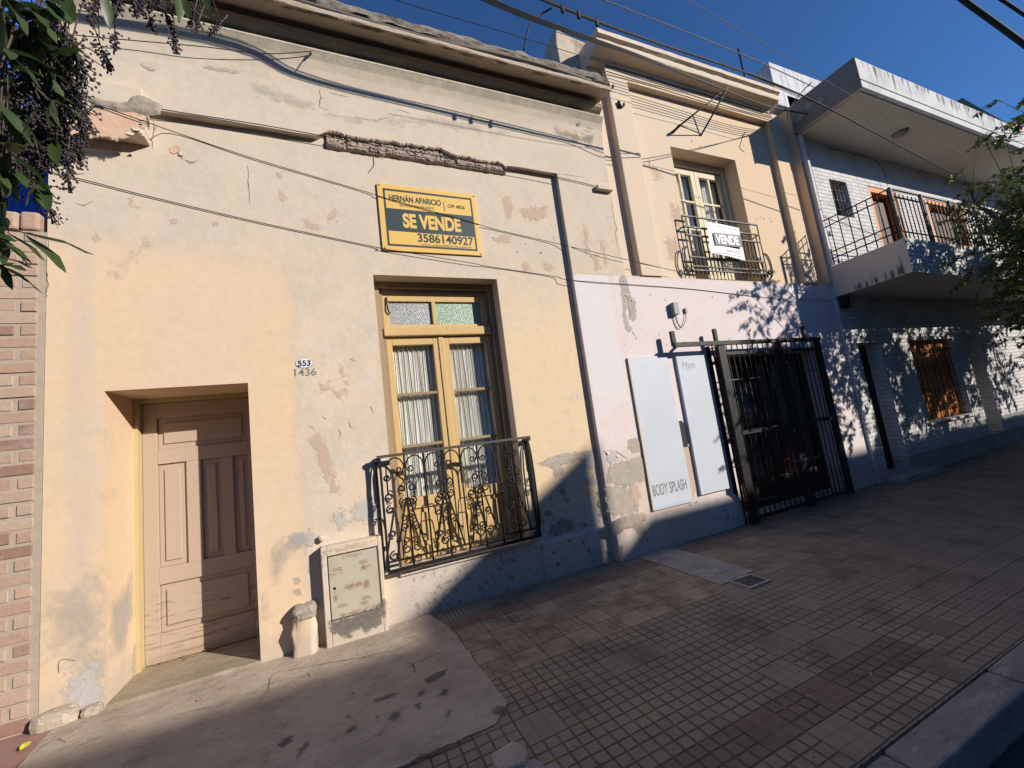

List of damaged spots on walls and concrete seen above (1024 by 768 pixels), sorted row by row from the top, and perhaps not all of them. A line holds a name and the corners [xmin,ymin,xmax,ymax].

peeling [69,95,163,142]
spalling [326,134,506,175]
peeling [619,275,637,332]
peeling [537,438,647,535]
water stain [329,599,387,638]
peeling [60,650,106,707]